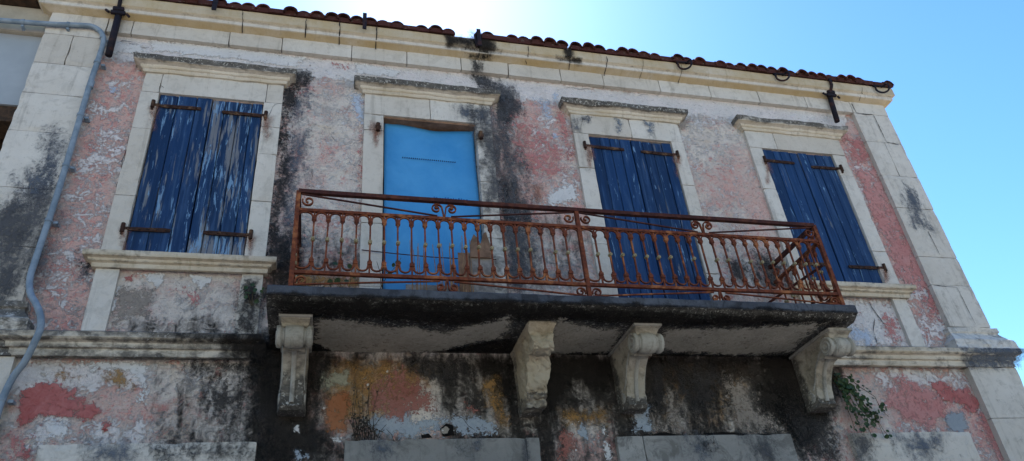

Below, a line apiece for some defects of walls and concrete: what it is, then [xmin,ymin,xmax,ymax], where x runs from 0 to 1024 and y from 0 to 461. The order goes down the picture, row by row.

water stain [0,129,67,300]
water stain [901,183,934,231]
water stain [148,33,874,461]
peeling [112,272,165,323]
peeling [181,274,212,305]
peeling [81,360,150,405]
flaking render [313,294,534,443]
peeling [0,371,115,461]
peeling [884,374,1004,461]
water stain [82,435,135,461]
water stain [892,432,942,460]